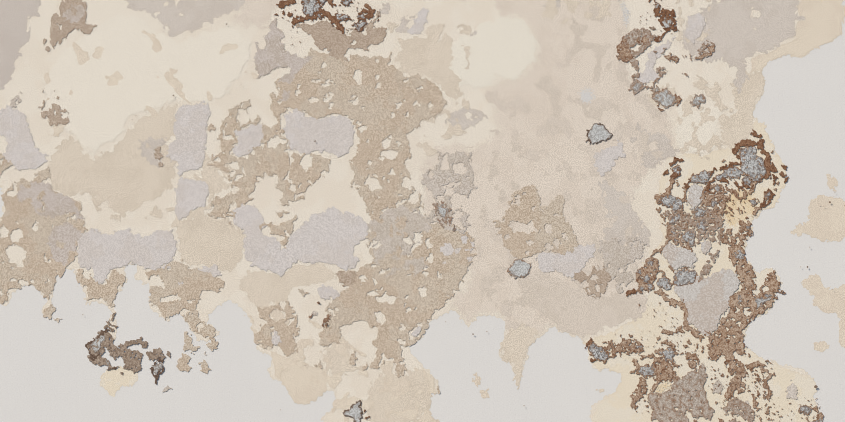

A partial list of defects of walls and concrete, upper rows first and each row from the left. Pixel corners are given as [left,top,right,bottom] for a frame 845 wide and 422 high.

rust [274,0,380,45]
rust [616,0,715,111]
peeling [679,0,806,149]
rust [586,123,613,144]
peeling [0,0,723,389]
rust [507,259,531,279]
peeling [662,242,741,338]
rust [585,129,824,422]
rust [85,312,171,384]
rust [343,400,370,422]